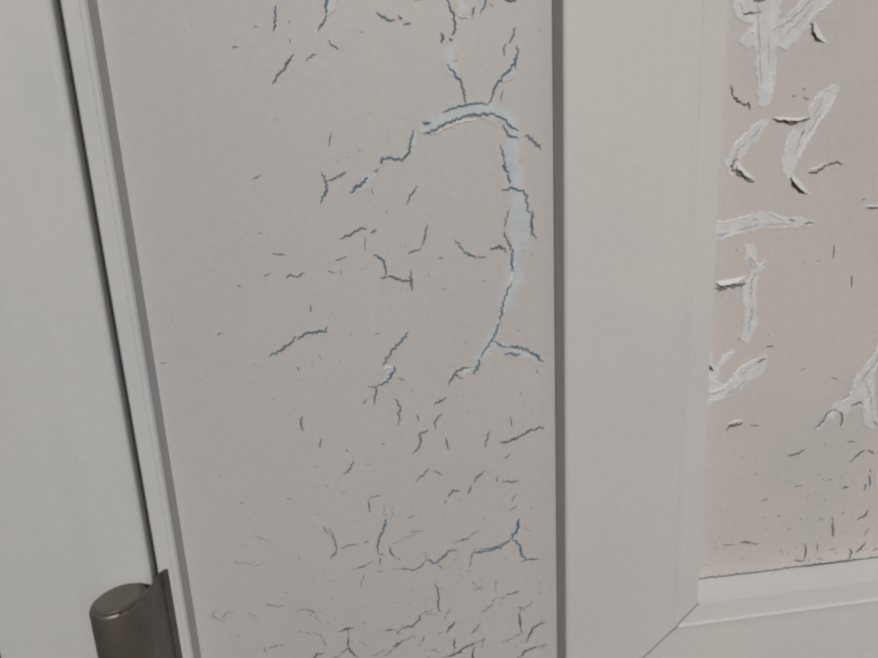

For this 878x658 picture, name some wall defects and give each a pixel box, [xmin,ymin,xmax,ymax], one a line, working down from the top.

crack [731,85,752,113]
peeling [722,0,841,195]
crack [809,161,842,173]
crack [251,0,547,658]
crack [727,419,759,432]
peeling [707,209,816,406]
peeling [813,339,878,431]
crack [700,450,878,580]